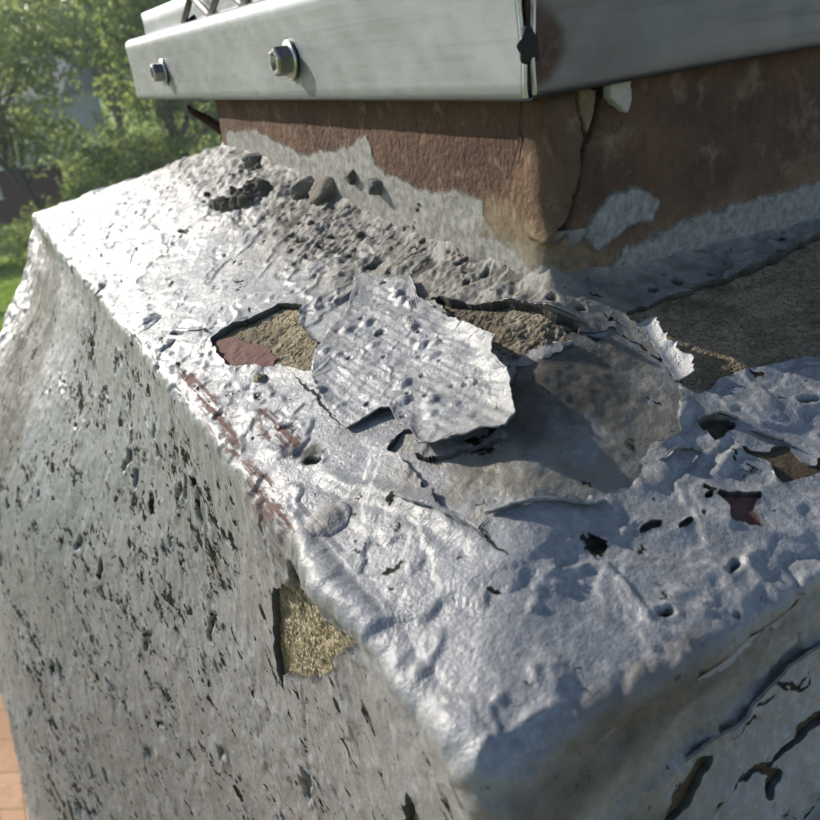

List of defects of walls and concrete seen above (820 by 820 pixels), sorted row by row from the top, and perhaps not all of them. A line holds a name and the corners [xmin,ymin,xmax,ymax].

crack [580,87,600,154]
peeling [213,240,820,537]
spalling [279,584,355,680]
peeling [685,643,820,763]